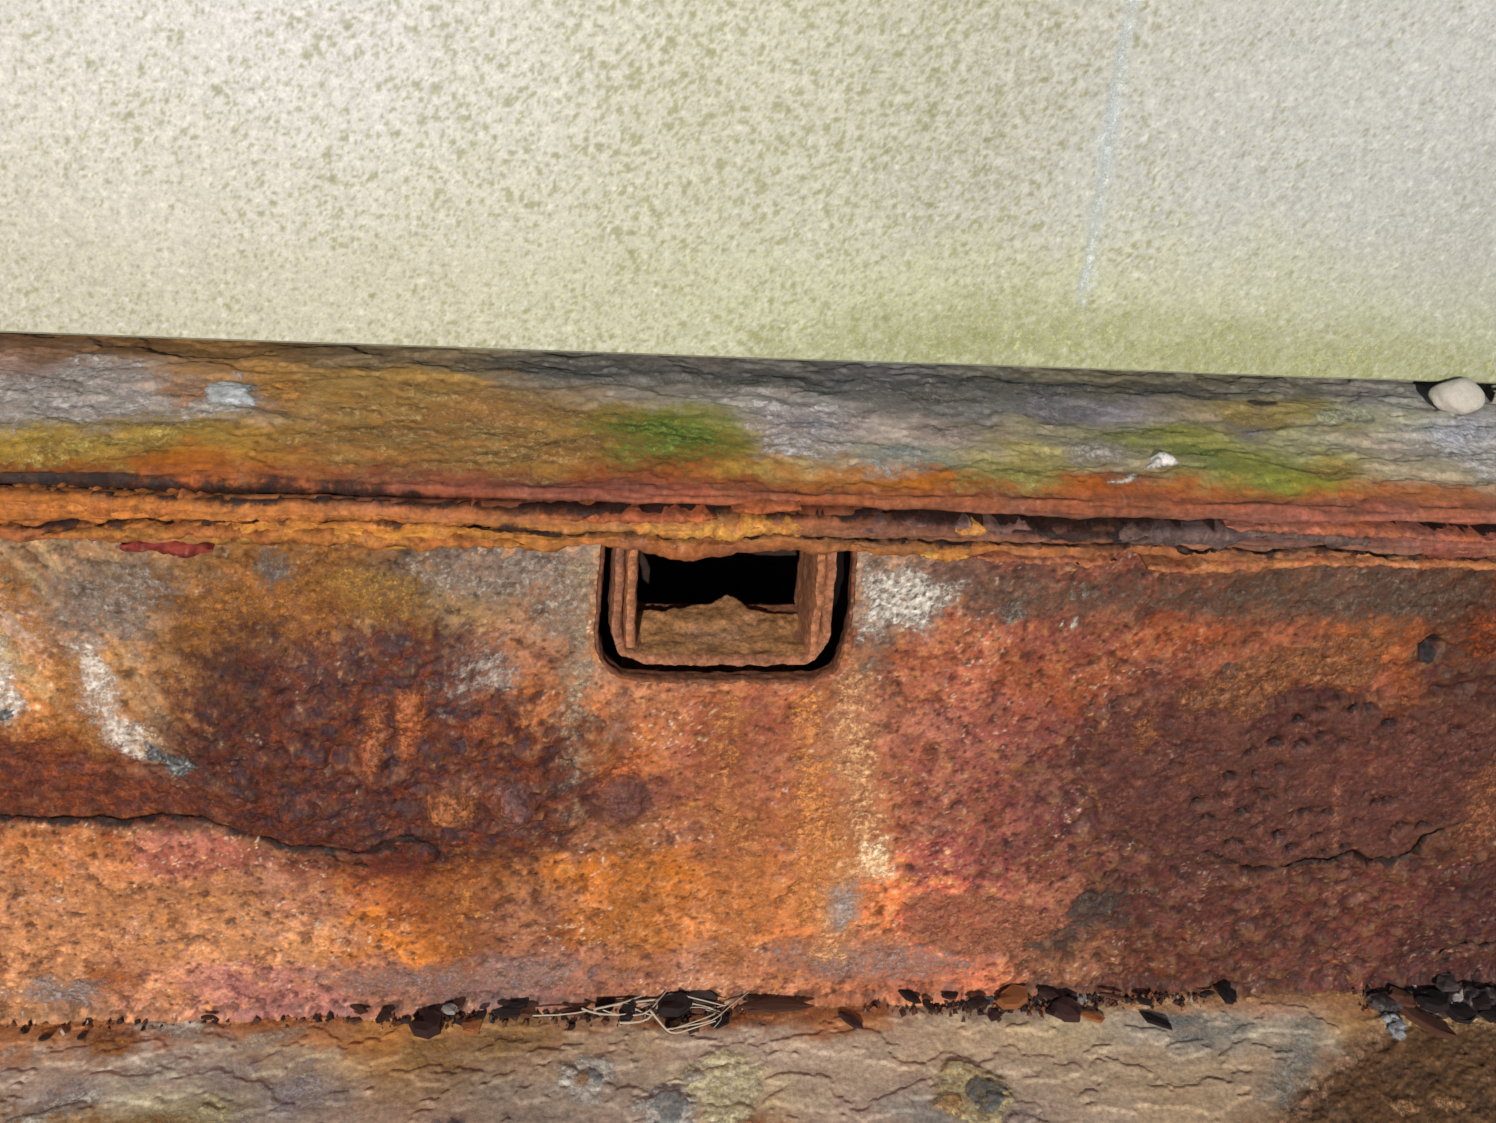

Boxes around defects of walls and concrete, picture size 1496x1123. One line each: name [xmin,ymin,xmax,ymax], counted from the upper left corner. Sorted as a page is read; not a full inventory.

corrosion [258,357,1288,484]
efflorescence [1398,411,1496,480]
corrosion [536,485,803,542]
corrosion [0,377,524,852]
corrosion [841,508,1496,721]
crack [0,812,441,868]
corrosion [0,1004,392,1064]
corrosion [559,990,999,1035]
peeling [1071,993,1101,1007]
corrosion [1037,984,1358,1108]
peeling [1274,981,1496,1123]
corrosion [1360,986,1496,1039]